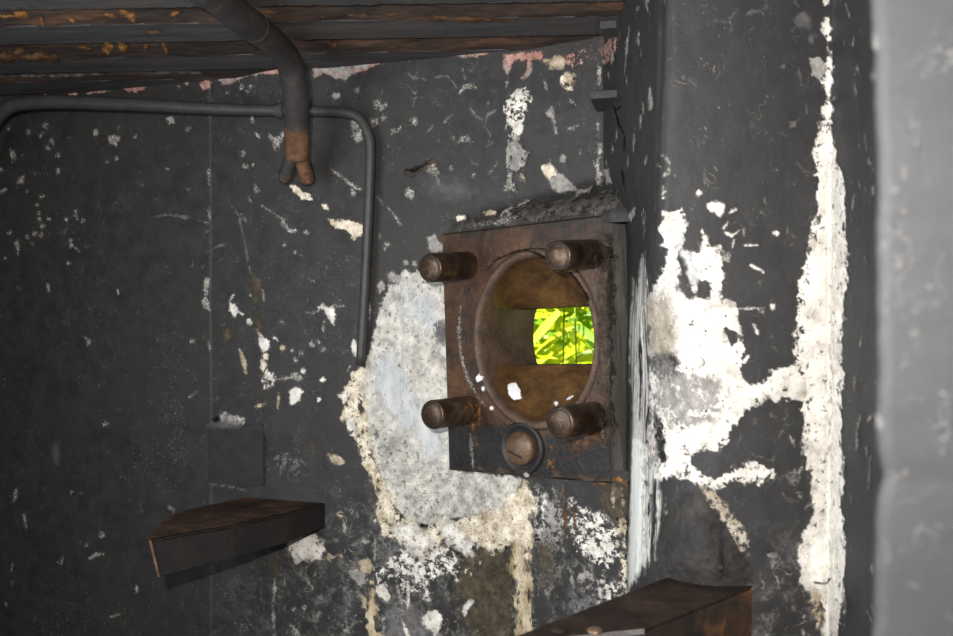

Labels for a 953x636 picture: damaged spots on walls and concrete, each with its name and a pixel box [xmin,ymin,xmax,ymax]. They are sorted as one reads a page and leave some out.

peeling [795,2,814,43]
peeling [646,155,810,555]
peeling [291,260,538,636]
peeling [854,413,885,491]
peeling [767,553,783,570]